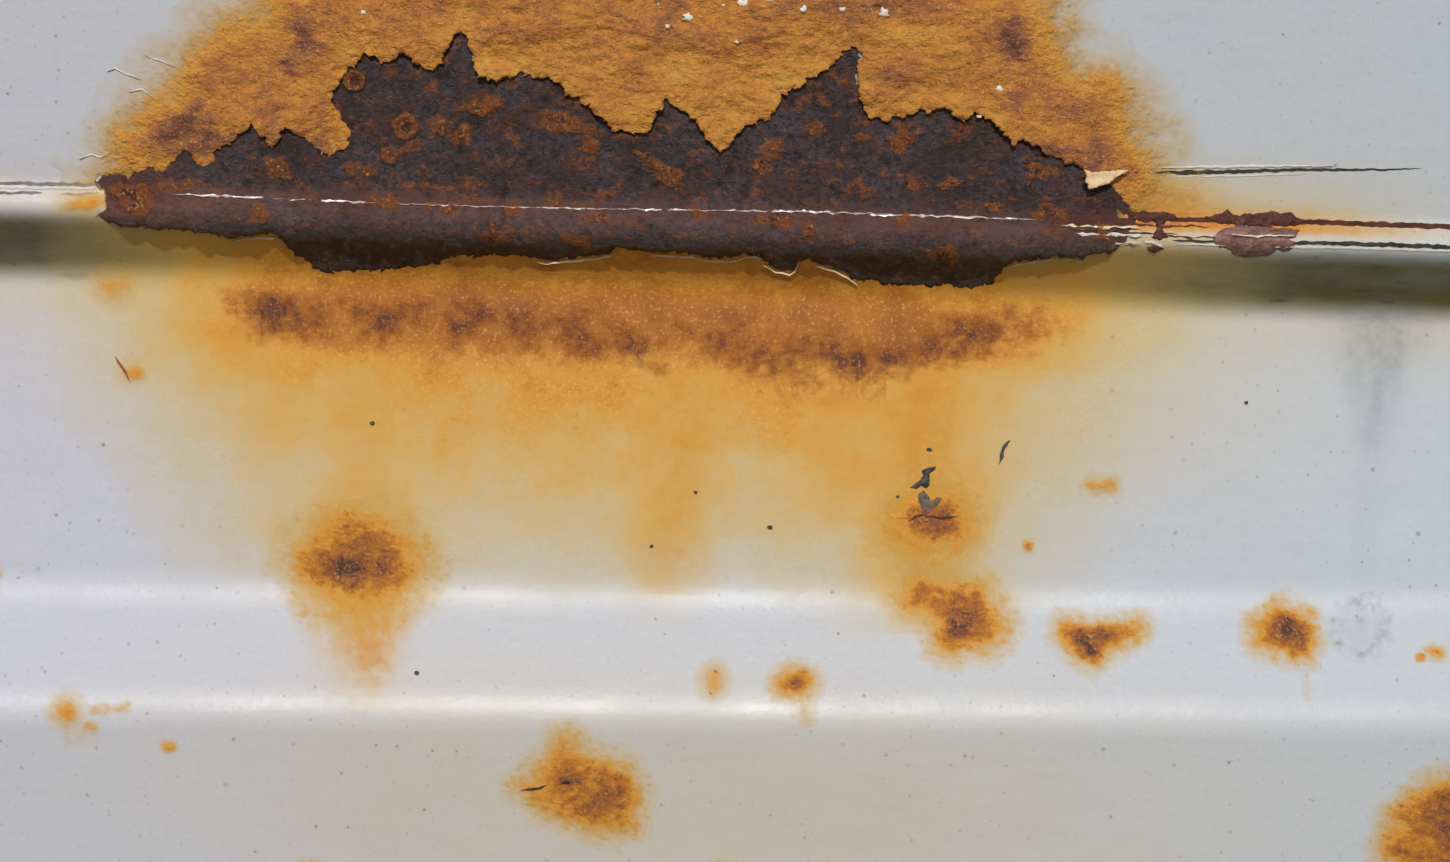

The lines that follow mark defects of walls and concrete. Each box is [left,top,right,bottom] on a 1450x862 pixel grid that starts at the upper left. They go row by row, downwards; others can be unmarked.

peeling [95,31,1147,290]
rust [1213,225,1300,258]
rust [101,220,1177,669]
rust [1246,597,1320,664]
rust [773,664,815,698]
rust [505,730,647,839]
rust [1378,772,1450,862]